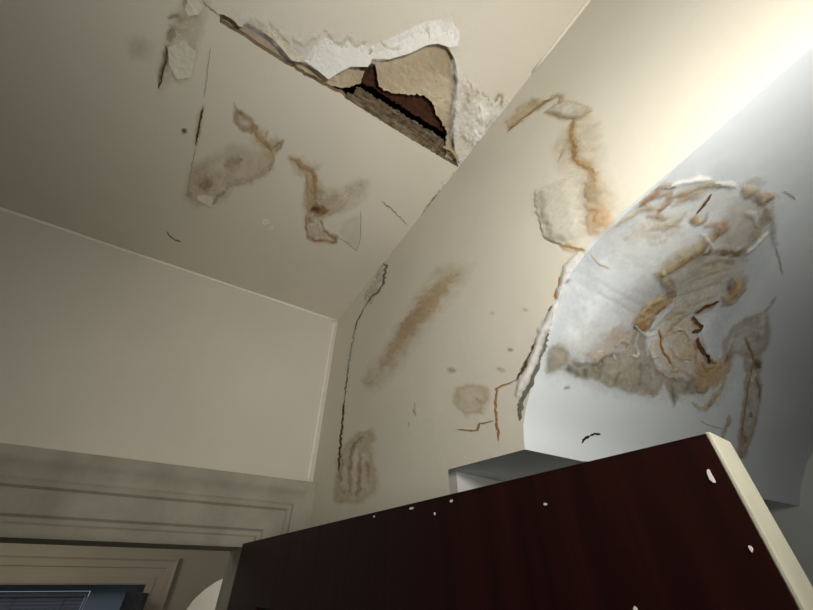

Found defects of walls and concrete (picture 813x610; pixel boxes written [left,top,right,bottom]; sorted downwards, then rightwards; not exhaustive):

peeling [158,0,219,89]
spalling [440,70,507,164]
water stain [196,127,282,208]
crack [338,263,388,471]
water stain [388,276,453,360]
crack [457,237,609,441]